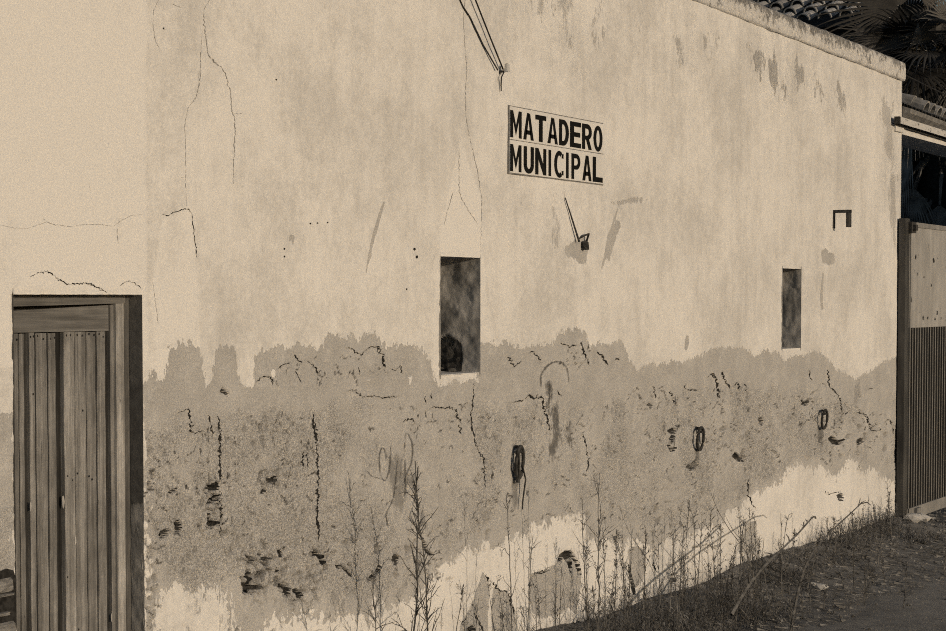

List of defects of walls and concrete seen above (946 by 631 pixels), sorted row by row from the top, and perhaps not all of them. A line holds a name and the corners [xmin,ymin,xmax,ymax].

crack [163,0,242,257]
crack [31,270,158,320]
crack [349,346,403,399]
crack [561,342,619,364]
crack [654,372,747,402]
crack [181,409,224,537]
crack [301,415,320,541]
crack [405,389,486,487]
flaking render [143,328,898,631]